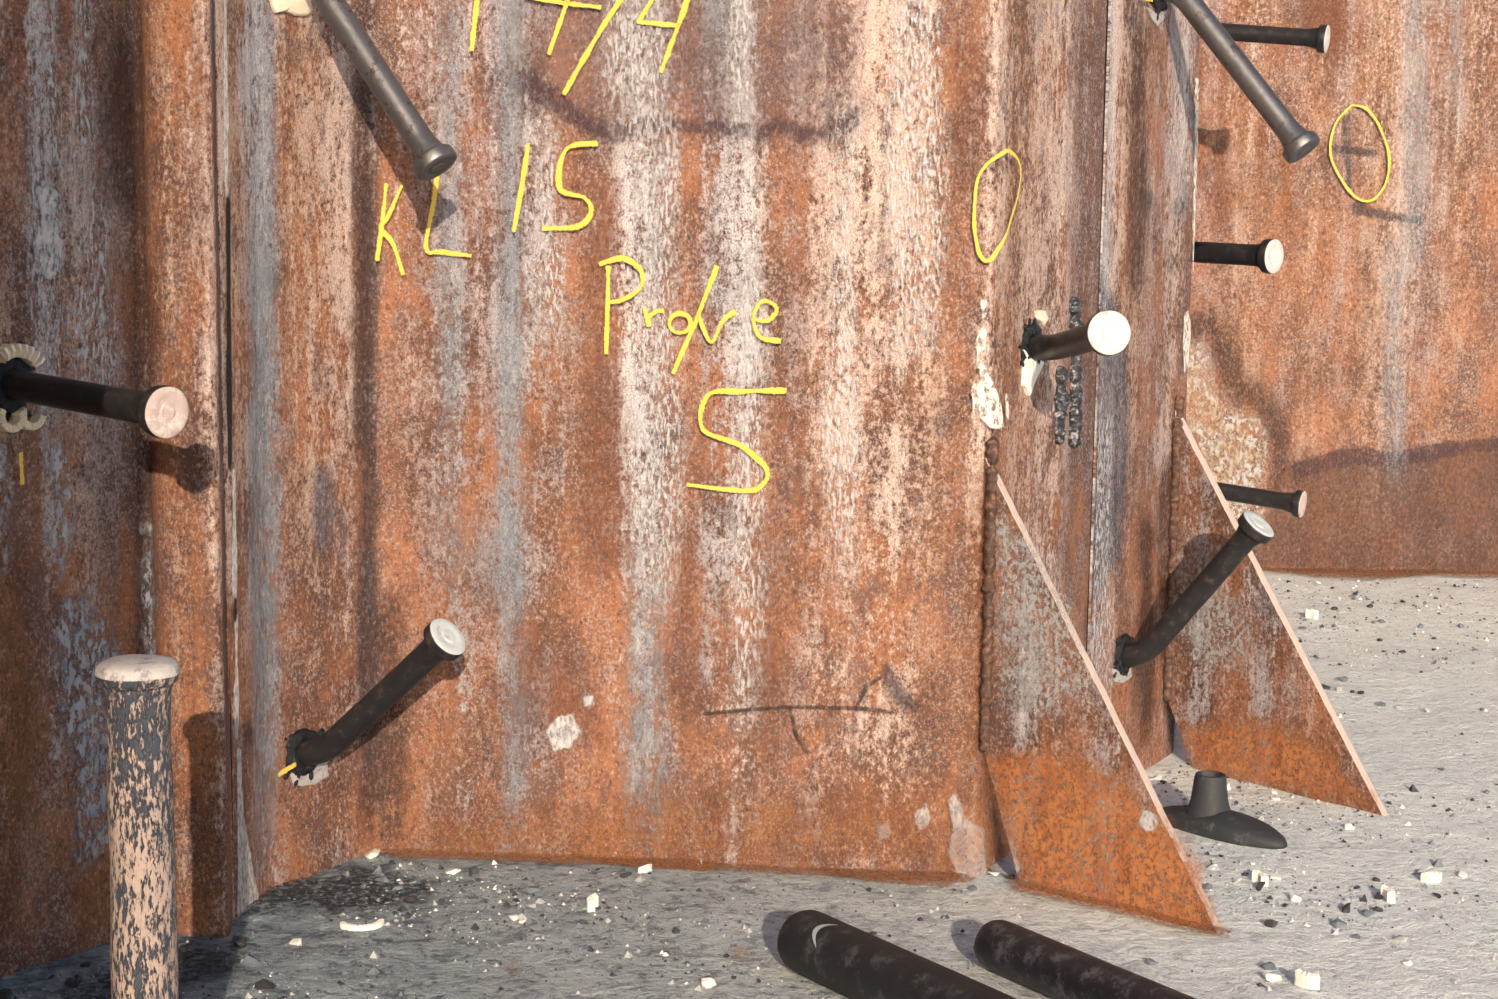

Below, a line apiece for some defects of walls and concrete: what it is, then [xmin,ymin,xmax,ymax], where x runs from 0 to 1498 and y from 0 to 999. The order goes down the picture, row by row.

corrosion [1262,567,1498,578]
corrosion [1182,718,1374,810]
corrosion [384,849,975,886]
corrosion [989,746,1230,935]